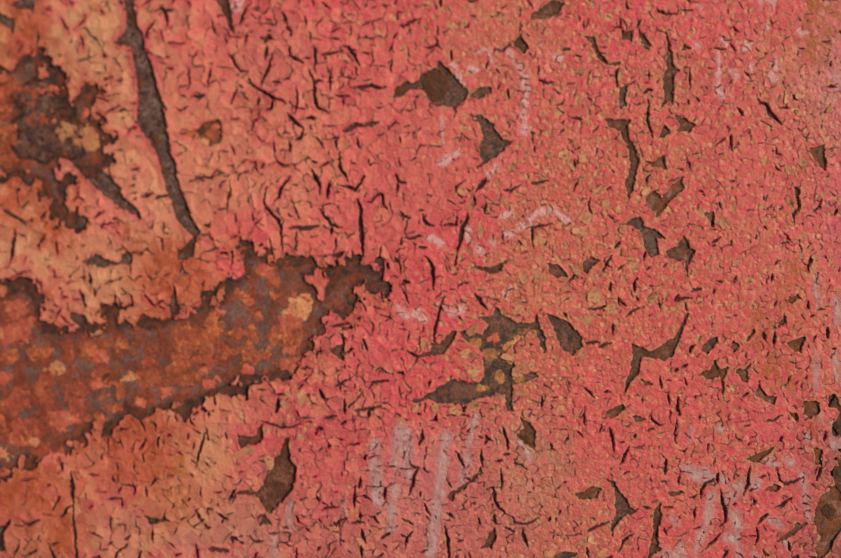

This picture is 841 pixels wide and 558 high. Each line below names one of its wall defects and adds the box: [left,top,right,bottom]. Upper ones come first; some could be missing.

peeling [0,32,145,232]
peeling [114,0,203,264]
crack [195,8,545,339]
peeling [393,61,491,122]
crack [8,213,163,322]
peeling [0,242,390,480]
crack [239,291,387,445]
peeling [412,297,588,414]
peeling [231,437,301,531]
crack [317,465,428,555]
crack [397,403,560,547]
crack [609,345,820,556]